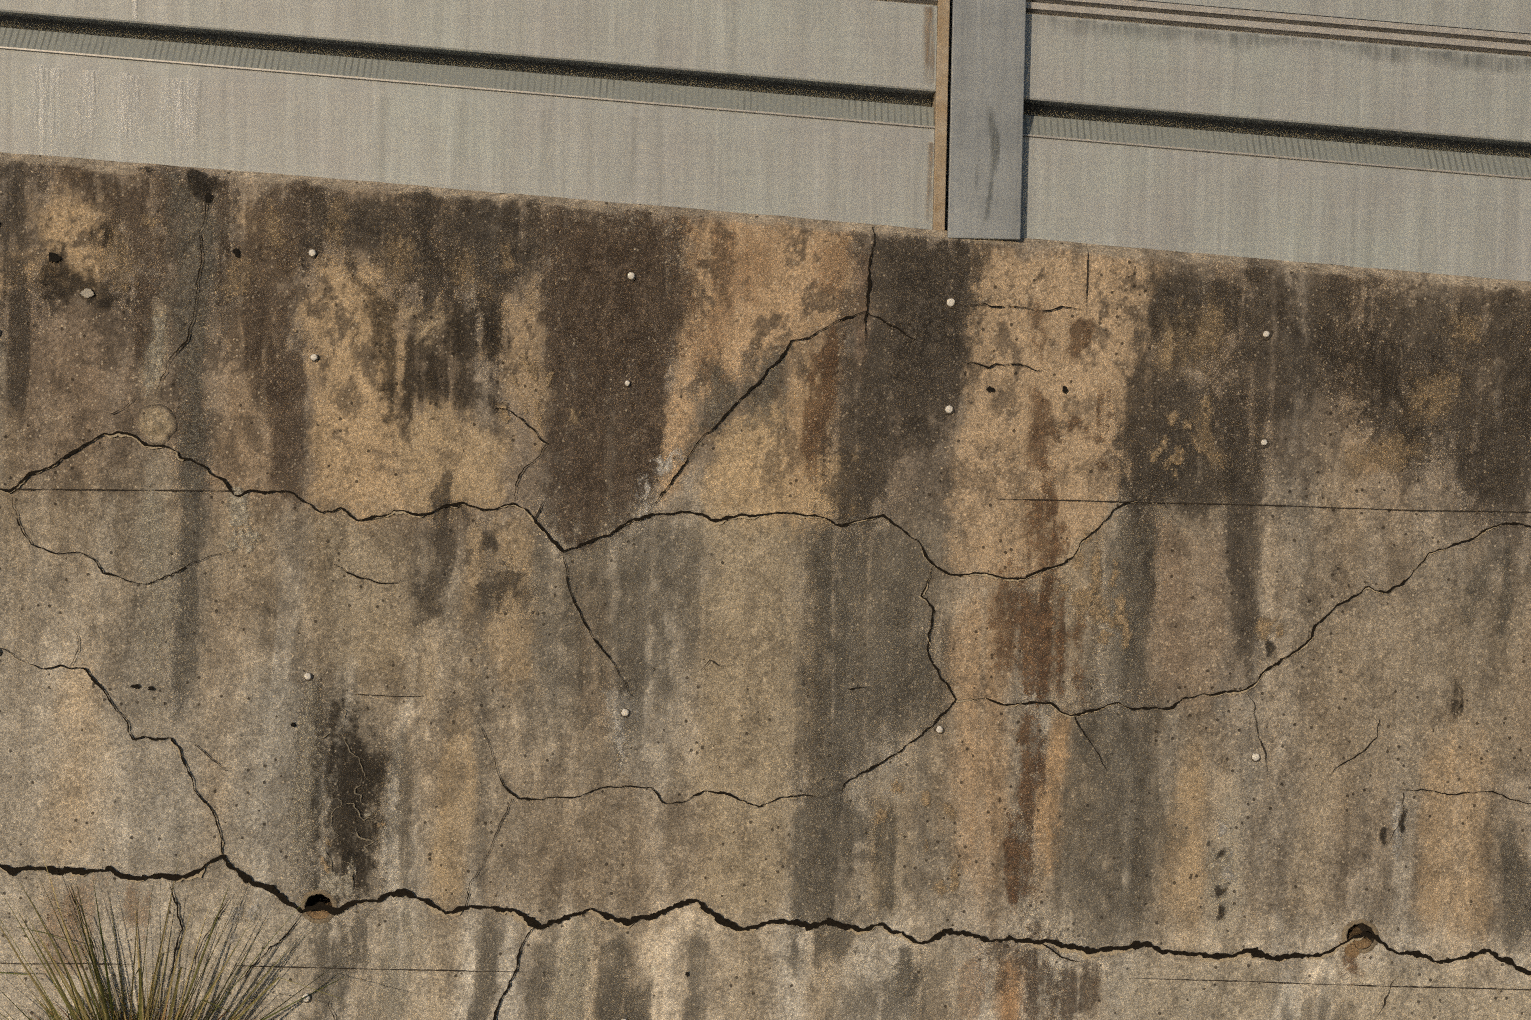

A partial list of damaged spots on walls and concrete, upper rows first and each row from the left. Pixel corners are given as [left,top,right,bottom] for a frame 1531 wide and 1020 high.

water stain [0,161,42,423]
water stain [290,681,410,897]
water stain [299,906,431,1020]
water stain [52,162,792,765]
crack [0,226,1531,1020]
water stain [827,944,927,1020]
water stain [778,231,995,977]
water stain [987,704,1188,1020]
water stain [1106,262,1531,692]
water stain [1451,679,1464,715]